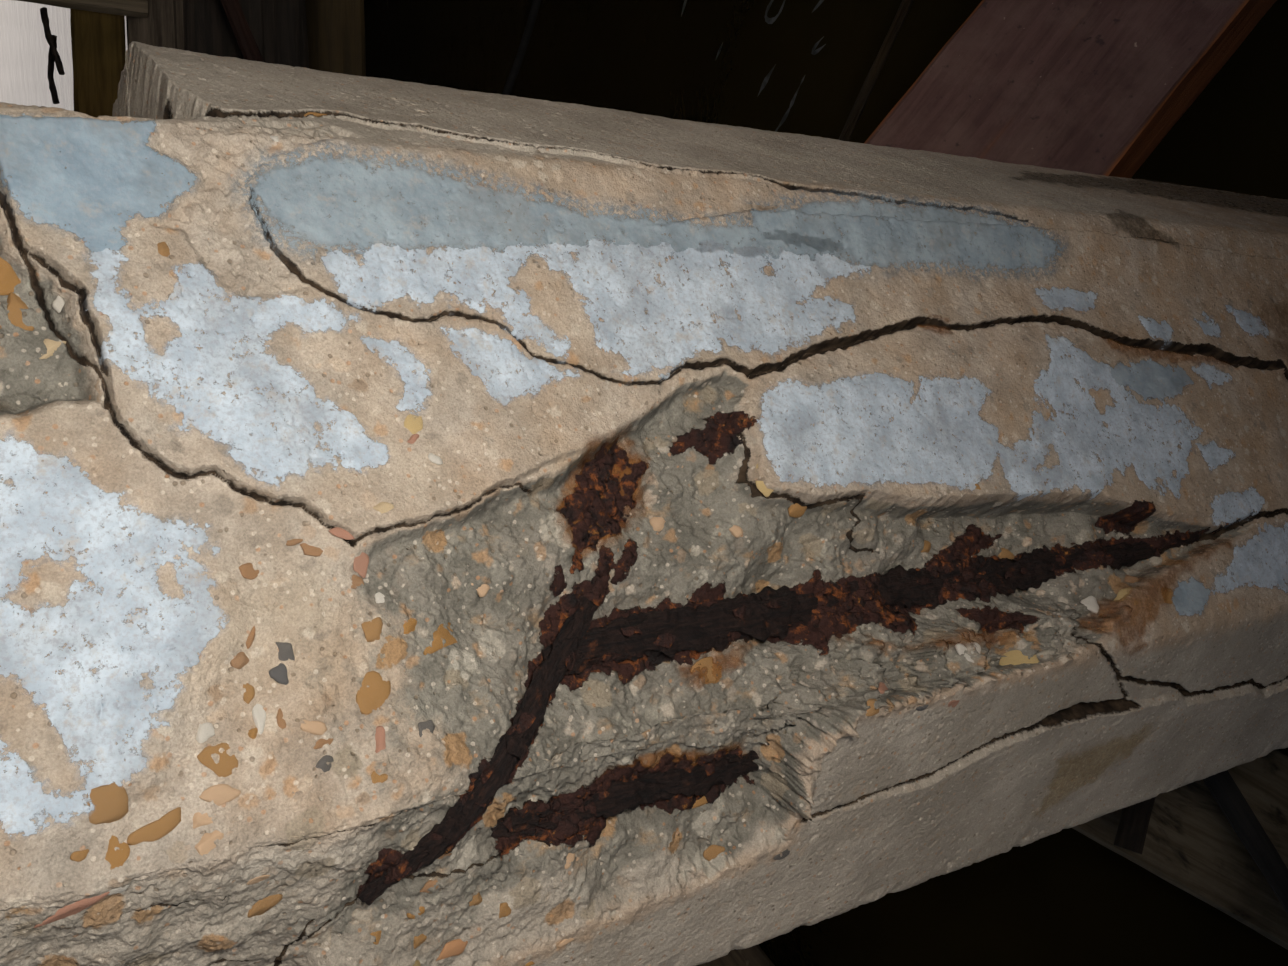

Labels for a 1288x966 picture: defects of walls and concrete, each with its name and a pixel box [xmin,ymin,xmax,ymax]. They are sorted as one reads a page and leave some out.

crack [205,108,1028,222]
crack [0,191,531,547]
peeling [0,42,1098,489]
rust [669,411,758,464]
crack [249,187,1288,386]
crack [736,433,873,553]
peeling [1138,315,1174,350]
crack [1159,508,1288,555]
peeling [1194,305,1269,338]
spalling [0,333,1288,966]
rust [357,431,1229,906]
crack [801,628,1288,822]